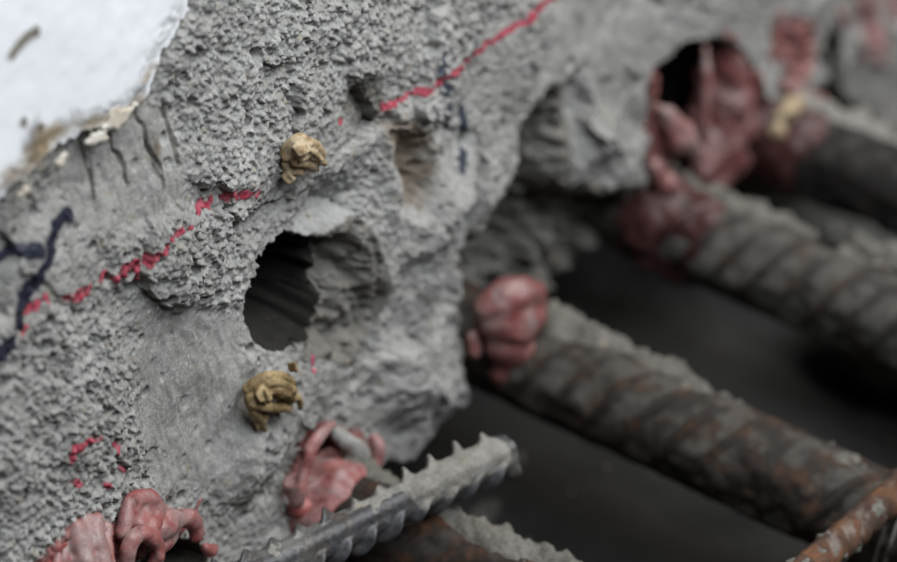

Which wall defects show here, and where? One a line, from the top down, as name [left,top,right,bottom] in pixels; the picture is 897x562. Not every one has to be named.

crack [648,0,690,11]
spalling [154,0,503,193]
spalling [811,15,897,135]
peeling [84,101,139,146]
peeling [54,151,68,169]
peeling [16,177,31,199]
spalling [287,163,362,236]
spalling [731,180,816,211]
spalling [109,203,255,310]